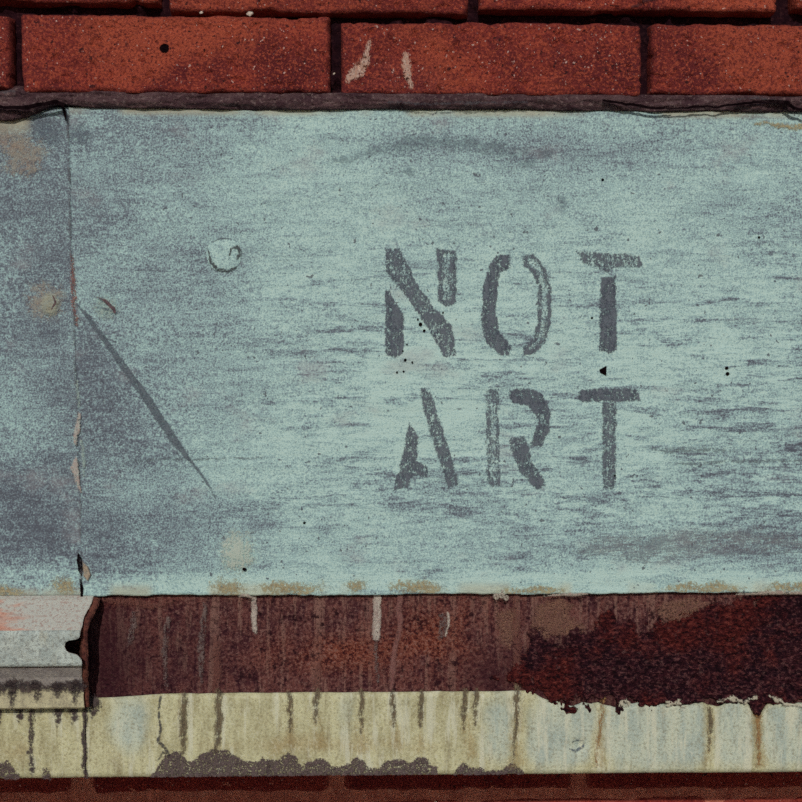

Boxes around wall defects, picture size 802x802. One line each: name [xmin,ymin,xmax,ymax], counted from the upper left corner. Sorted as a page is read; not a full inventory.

rust [65,579,802,766]
water stain [0,678,102,779]
water stain [179,692,189,754]
water stain [214,689,224,752]
water stain [357,688,365,734]